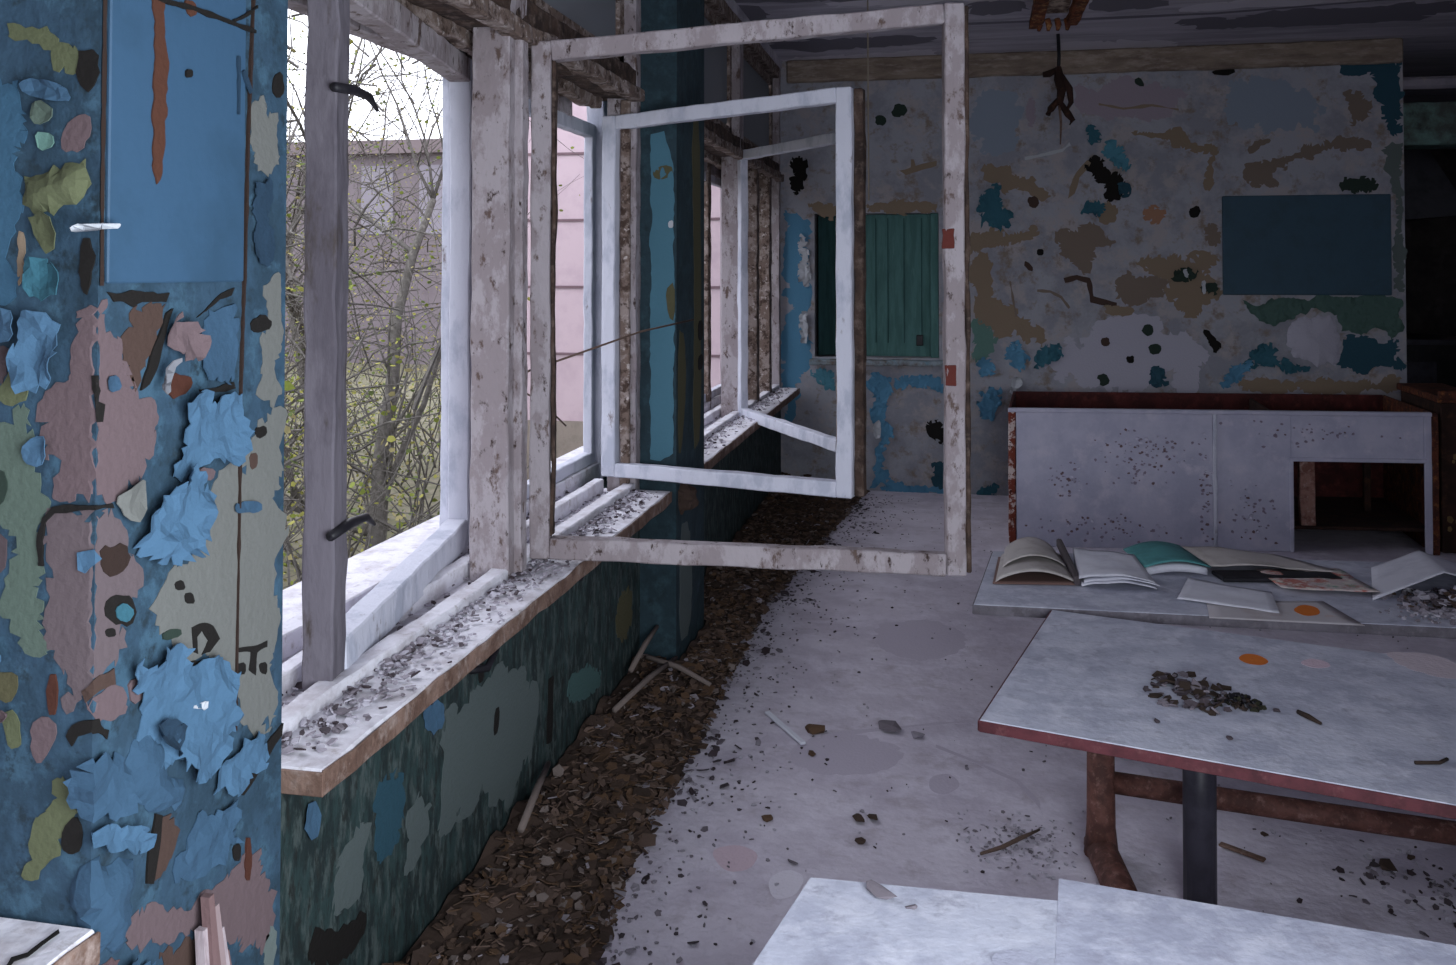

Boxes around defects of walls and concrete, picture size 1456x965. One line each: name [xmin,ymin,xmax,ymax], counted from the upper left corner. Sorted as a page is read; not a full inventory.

peeling [781,210,836,422]
peeling [976,183,1039,232]
peeling [971,313,1221,422]
flaking render [1080,124,1132,225]
flaking render [1143,205,1166,225]
flaking render [1189,206,1201,218]
peeling [1171,267,1219,296]
peeling [1219,63,1408,395]
peeling [866,372,944,494]
peeling [0,23,290,965]